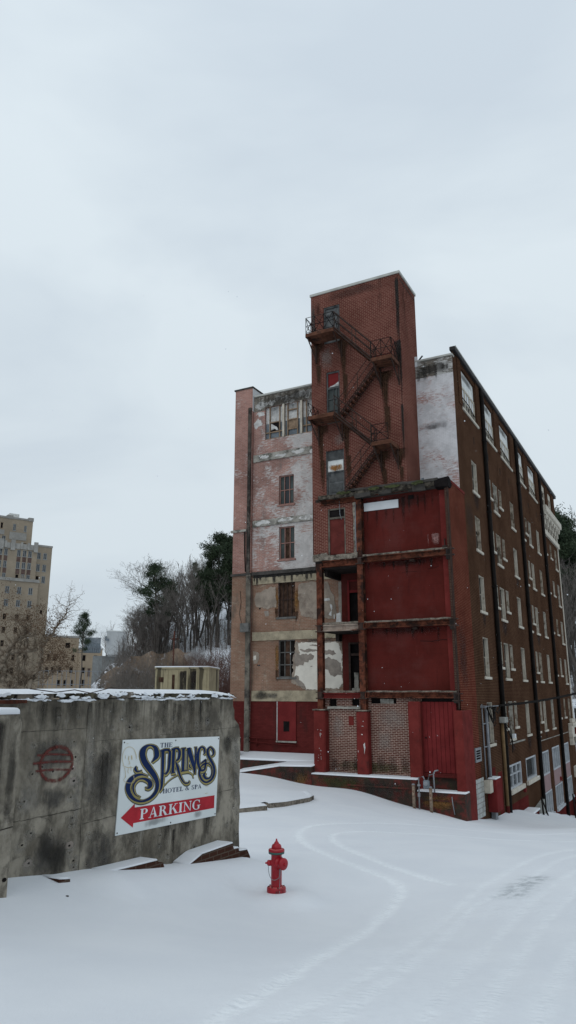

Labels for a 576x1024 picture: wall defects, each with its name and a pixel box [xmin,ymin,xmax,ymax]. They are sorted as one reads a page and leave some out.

rust [312,343,324,383]
peeling [254,389,312,429]
rust [381,370,392,430]
rust [317,422,352,480]
flaking render [291,639,343,691]